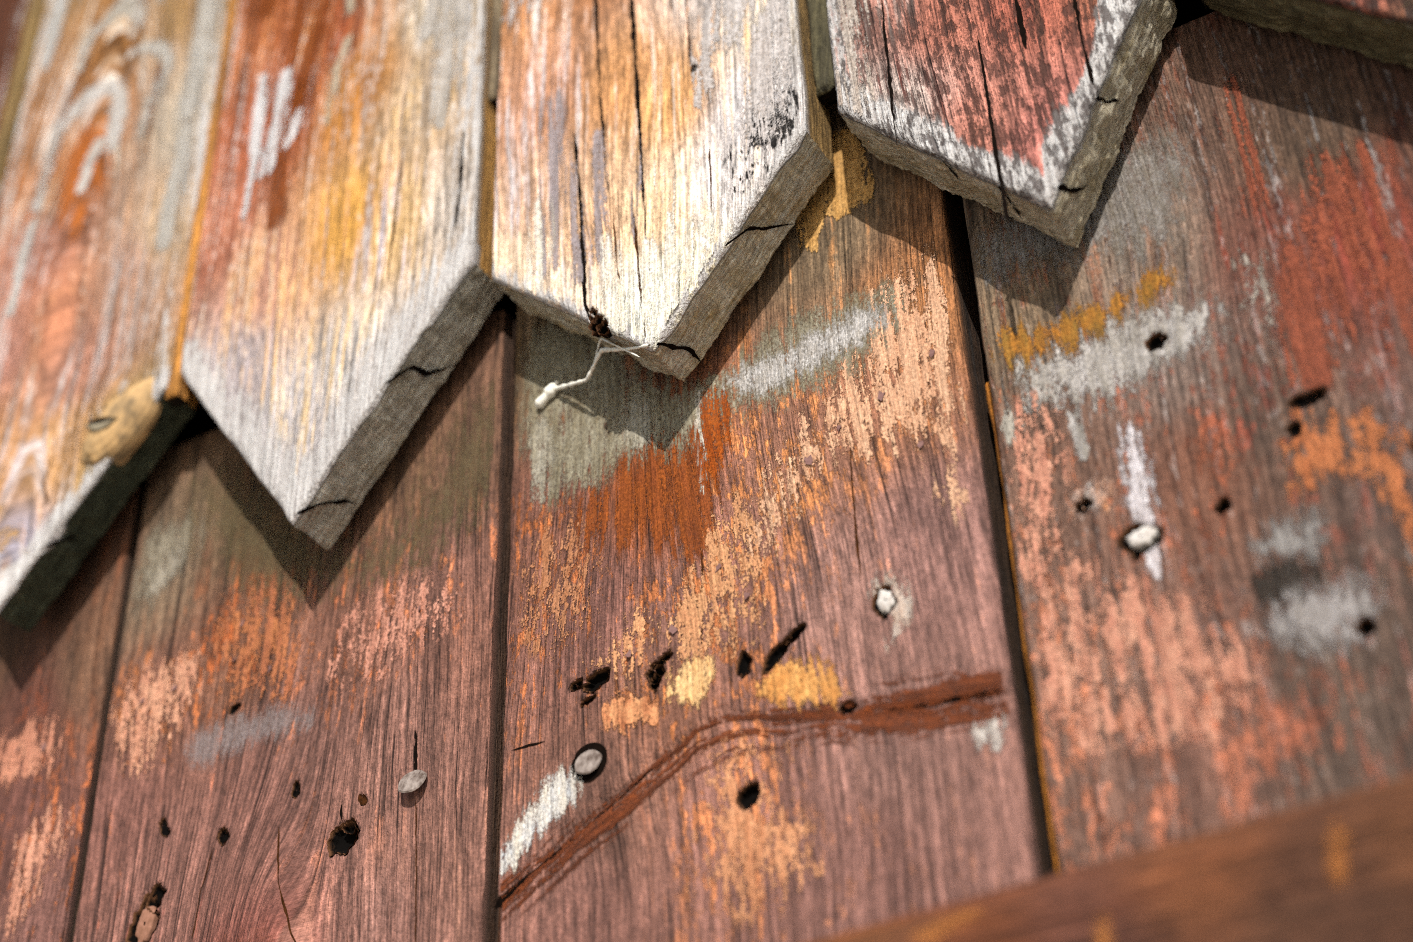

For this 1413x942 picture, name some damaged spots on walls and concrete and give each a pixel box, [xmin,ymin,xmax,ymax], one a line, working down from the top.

crack [573,0,701,363]
peeling [796,128,875,255]
crack [881,0,897,146]
crack [977,36,1023,224]
crack [1015,0,1027,49]
peeling [991,265,1177,370]
peeling [517,242,970,735]
peeling [1278,396,1413,580]
peeling [1008,392,1263,759]
peeling [0,714,66,790]
peeling [0,802,74,939]
crack [494,743,675,909]